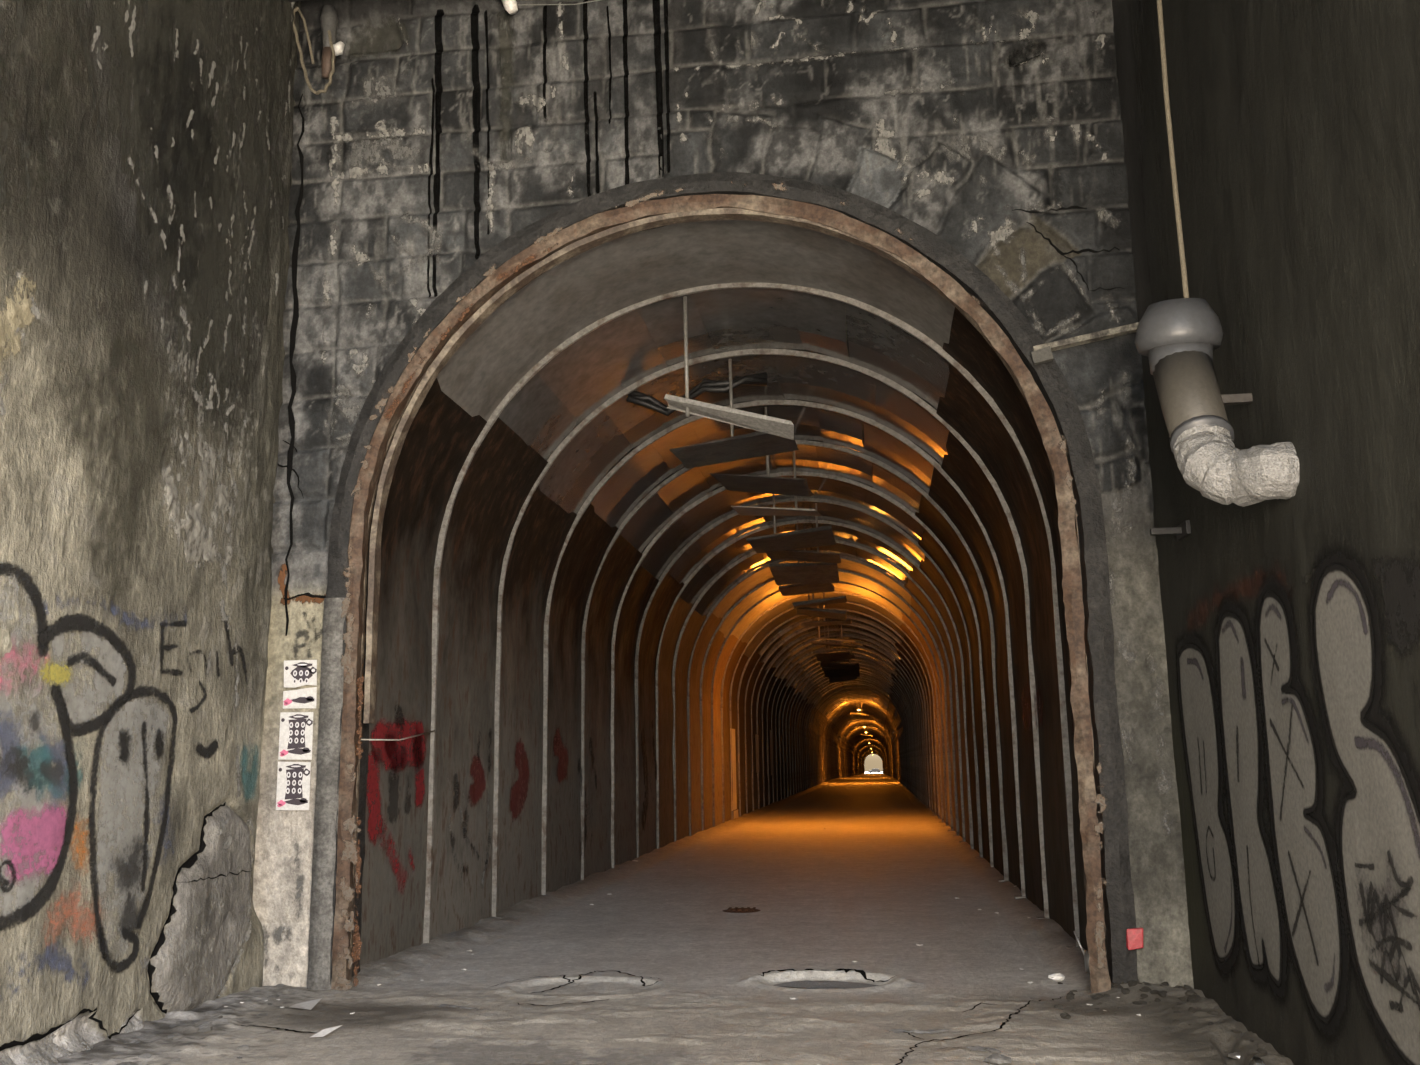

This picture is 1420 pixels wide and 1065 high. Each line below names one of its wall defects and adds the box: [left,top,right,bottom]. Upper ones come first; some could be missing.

spalling [0,272,40,415]
crack [277,94,326,636]
leakage [470,0,630,259]
crack [1012,206,1125,291]
crack [0,802,252,1051]
crack [895,996,1065,1065]